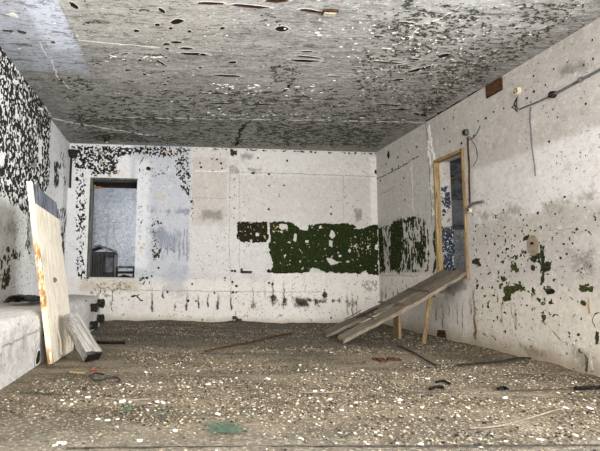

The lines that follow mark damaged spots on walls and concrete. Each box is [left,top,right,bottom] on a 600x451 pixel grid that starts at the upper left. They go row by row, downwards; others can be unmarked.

crack [52,117,303,146]
peeling [57,0,585,308]
crack [318,87,484,132]